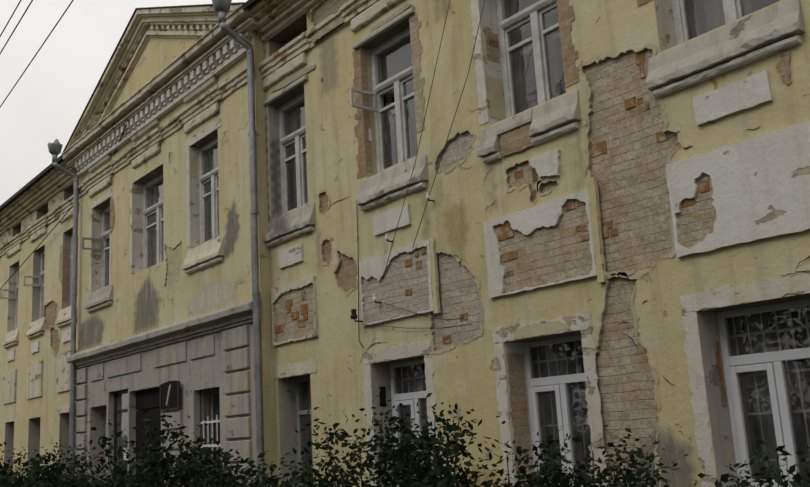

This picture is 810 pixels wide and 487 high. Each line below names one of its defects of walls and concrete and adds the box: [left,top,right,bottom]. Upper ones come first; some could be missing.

spalling [574,47,652,177]
spalling [435,131,468,172]
spalling [506,160,559,202]
flaking render [564,201,585,211]
flaking render [682,181,710,207]
flaking render [497,221,514,241]
flaking render [601,220,618,239]
flaking render [405,247,426,269]
flaking render [502,250,518,276]
crack [781,256,810,276]
flaking render [275,290,308,333]
spalling [431,312,469,351]